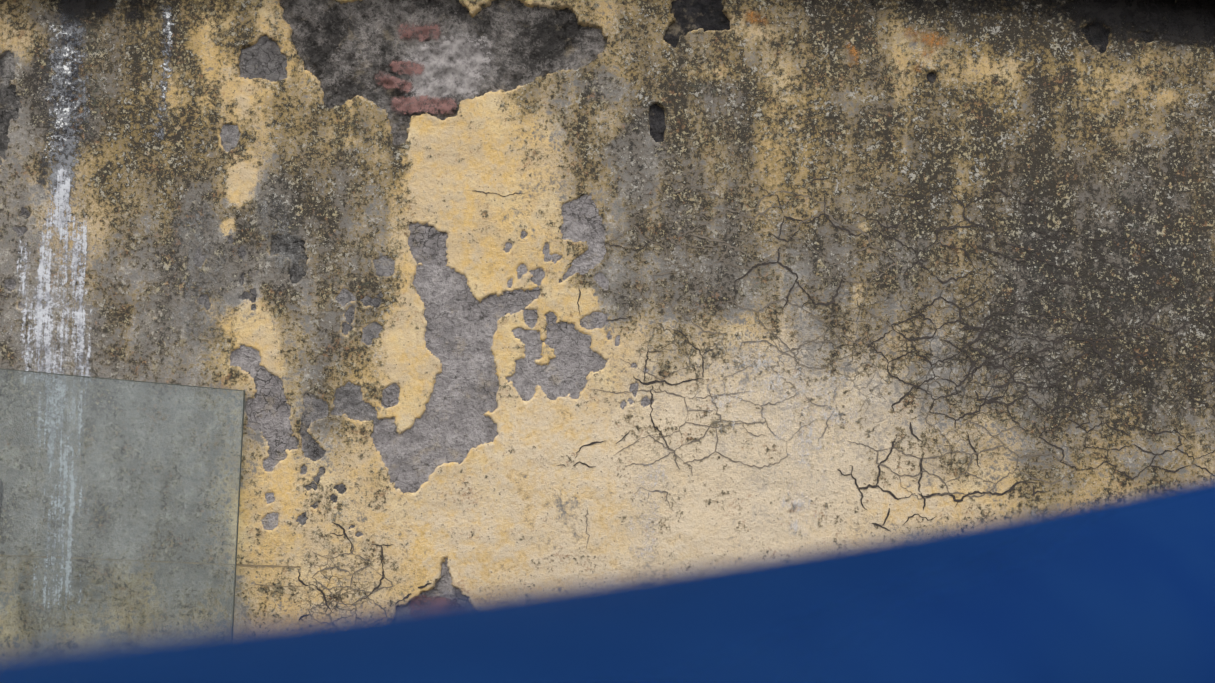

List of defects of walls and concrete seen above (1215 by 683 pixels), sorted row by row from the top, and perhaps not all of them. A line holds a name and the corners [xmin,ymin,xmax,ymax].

spalling [0,51,22,169]
spalling [239,0,607,145]
spalling [649,104,666,142]
spalling [663,0,730,48]
water stain [869,0,1215,51]
peeling [12,207,31,237]
water stain [11,0,174,615]
peeling [228,194,620,530]
peeling [620,363,654,410]
crack [557,166,1215,531]
crack [0,522,431,621]
spalling [396,558,469,609]